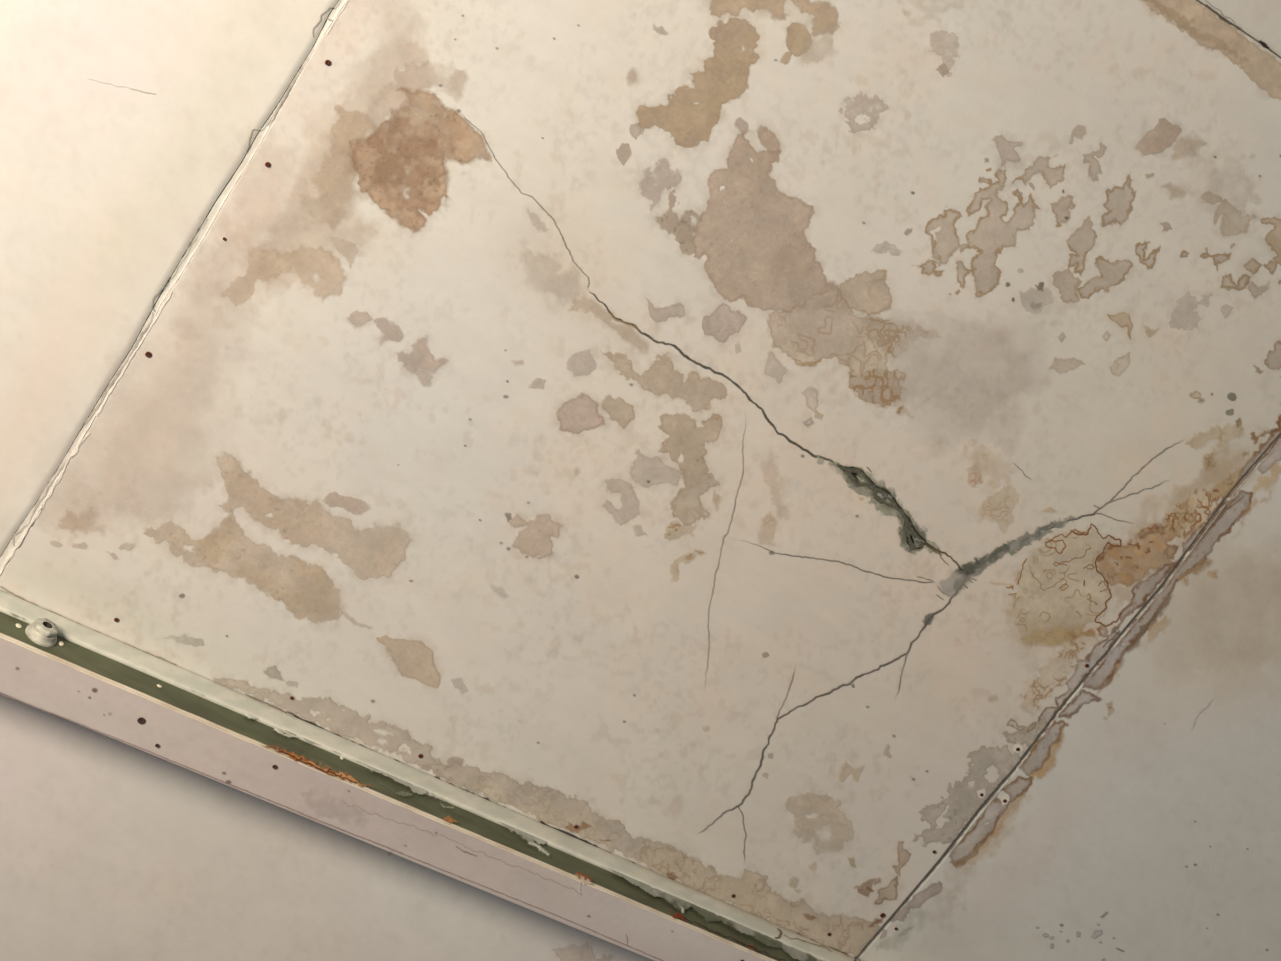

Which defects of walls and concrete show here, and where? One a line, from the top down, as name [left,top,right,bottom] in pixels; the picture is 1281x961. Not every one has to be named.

leakage [221,237,355,305]
crack [464,117,841,674]
leakage [1138,482,1233,539]
leakage [1006,523,1122,709]
peeling [914,415,1281,867]
crack [246,694,404,764]
crack [701,433,1281,961]
rust [264,745,373,787]
peeling [333,750,454,808]
peeling [499,821,549,855]
crack [540,821,634,863]
peeling [609,868,821,961]